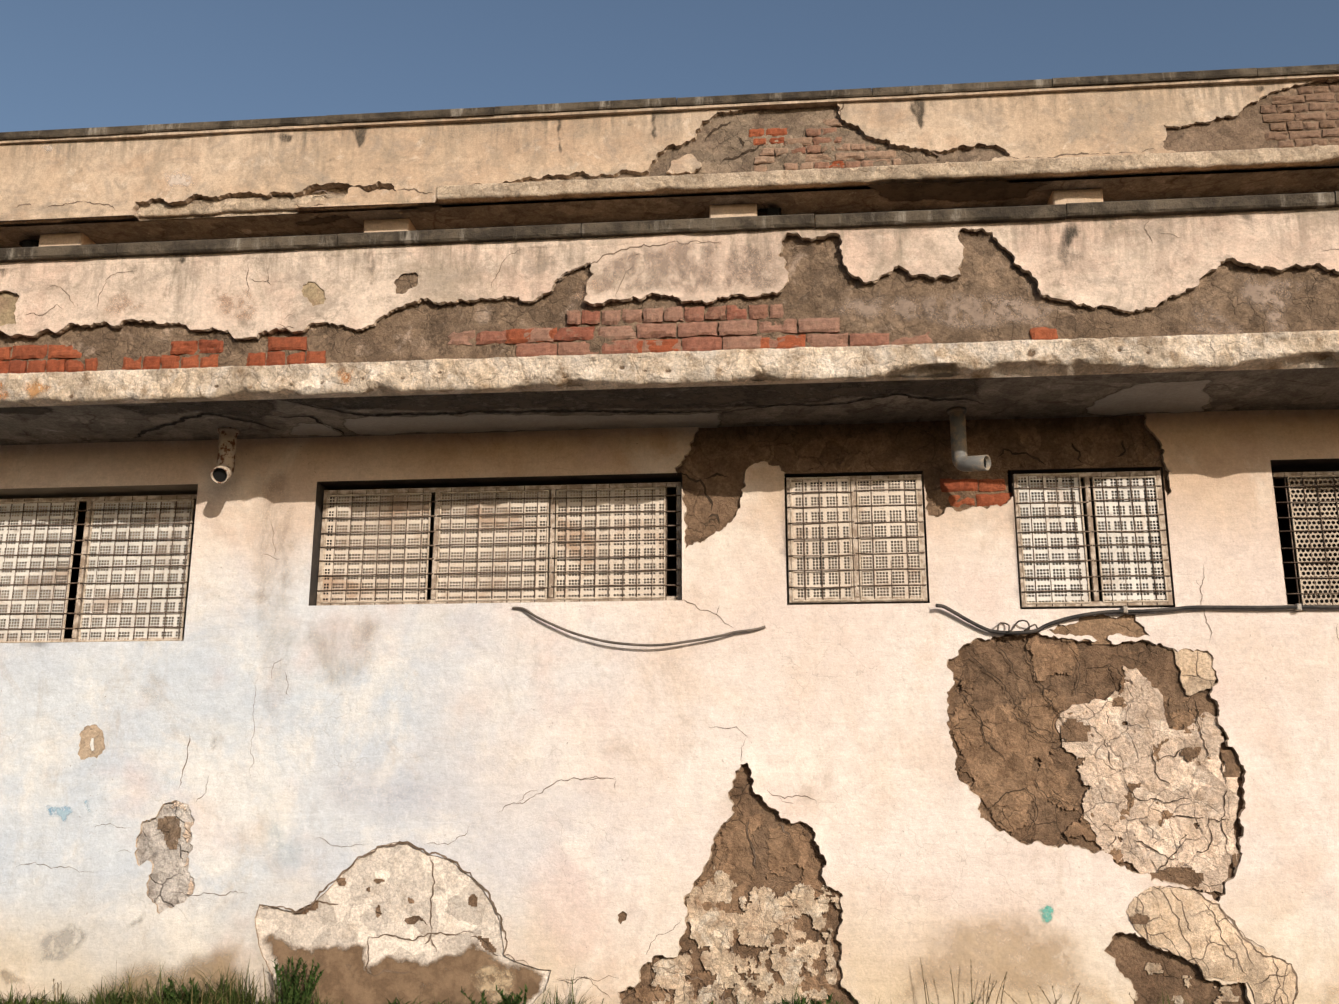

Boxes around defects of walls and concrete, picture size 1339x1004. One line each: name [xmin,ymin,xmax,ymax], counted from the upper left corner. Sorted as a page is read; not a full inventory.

spalling [132,174,396,226]
spalling [503,106,1046,202]
spalling [1163,79,1339,152]
spalling [0,228,1339,380]
spalling [115,370,1212,551]
peeling [78,724,105,760]
crack [499,776,616,812]
spalling [946,614,1246,902]
spalling [134,800,195,914]
spalling [255,841,551,1004]
spalling [618,763,858,1004]
spalling [1104,932,1251,1004]